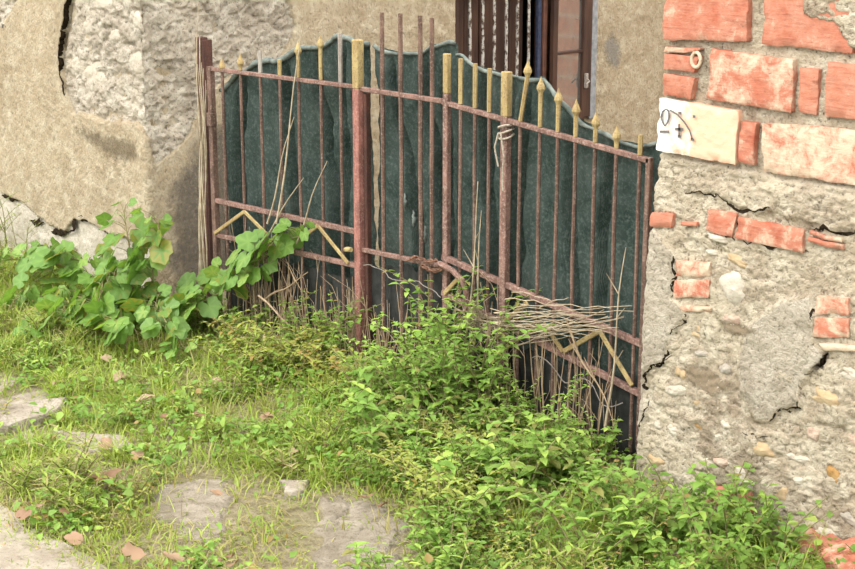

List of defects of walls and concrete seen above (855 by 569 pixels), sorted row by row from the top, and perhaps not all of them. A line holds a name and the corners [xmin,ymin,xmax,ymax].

spalling [0,0,17,28]
spalling [64,0,294,163]
spalling [656,0,855,185]
peeling [0,192,133,276]
crack [669,256,677,297]
crack [685,190,778,250]
crack [638,314,687,427]
crack [742,353,828,438]